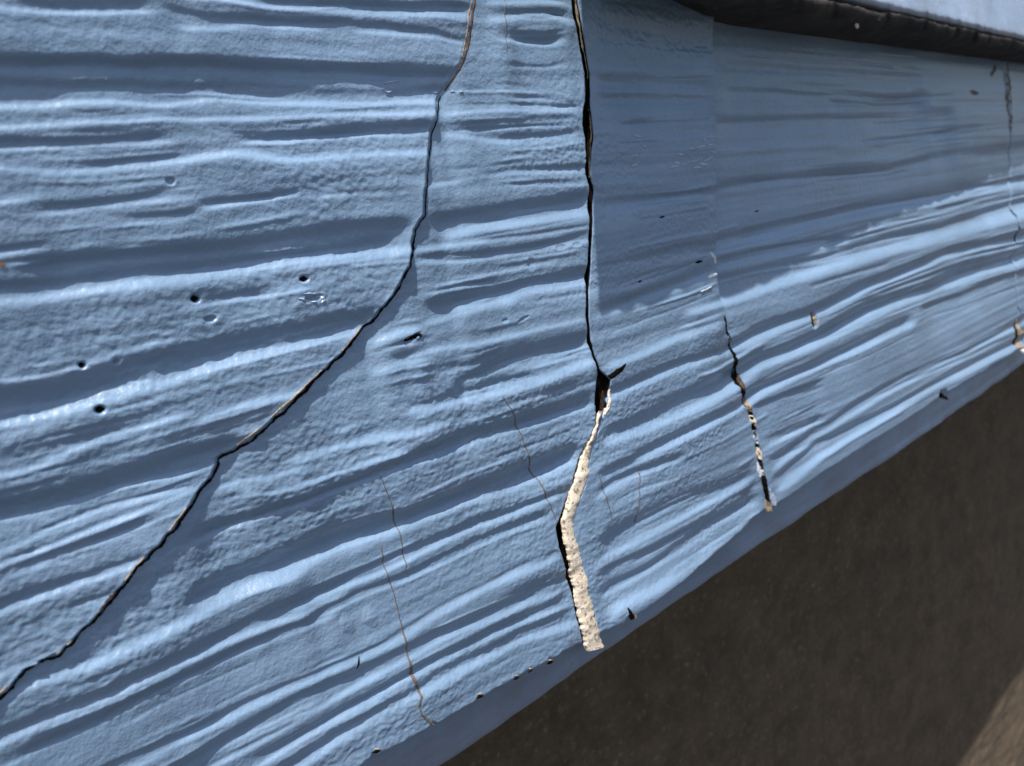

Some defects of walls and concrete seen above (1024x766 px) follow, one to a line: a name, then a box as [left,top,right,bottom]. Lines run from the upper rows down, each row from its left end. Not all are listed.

crack [0,0,476,726]
crack [502,0,641,651]
crack [724,316,771,504]